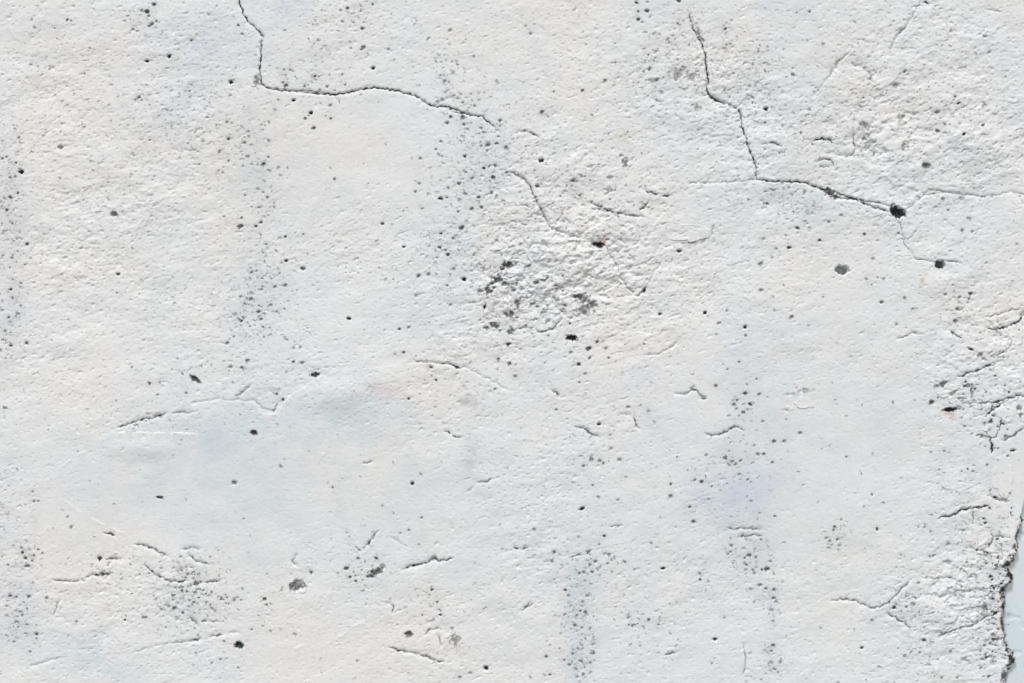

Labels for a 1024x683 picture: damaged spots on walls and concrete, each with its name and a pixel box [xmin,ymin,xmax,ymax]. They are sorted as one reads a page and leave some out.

crack [239,0,497,131]
crack [689,16,955,262]
peeling [965,496,1024,683]